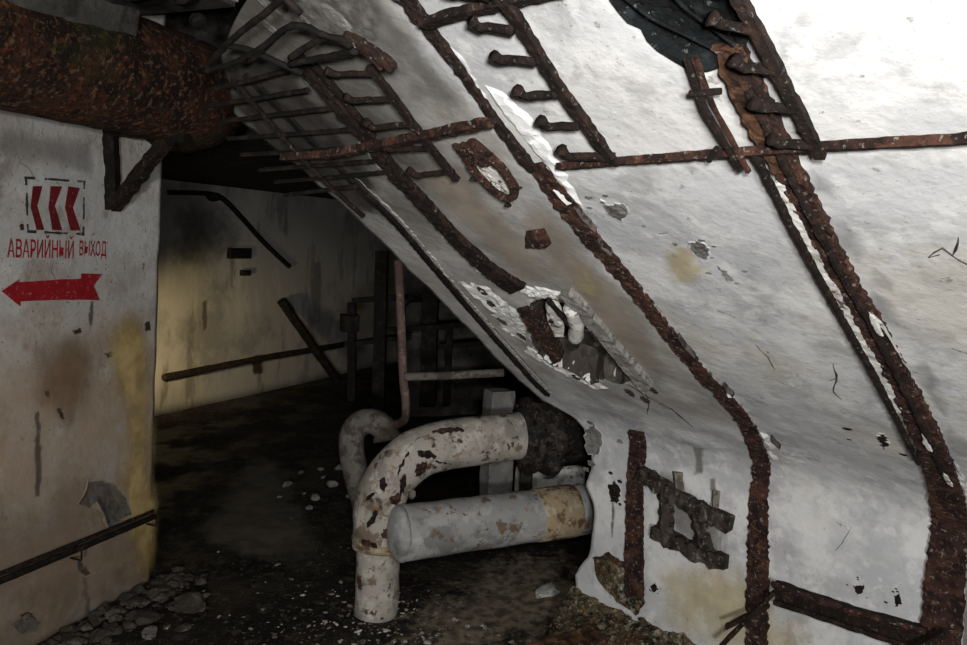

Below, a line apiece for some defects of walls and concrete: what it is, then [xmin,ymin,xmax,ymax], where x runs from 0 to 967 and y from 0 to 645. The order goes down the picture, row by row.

spalling [610,0,749,72]
spalling [202,0,658,404]
spalling [672,239,748,284]
crack [928,237,967,279]
corrosion [516,305,565,364]
peeling [869,312,910,371]
peeling [654,304,781,460]
spalling [583,421,603,472]
spalling [607,471,626,506]
peeling [943,462,967,508]
spalling [673,504,695,540]
spalling [592,552,661,616]